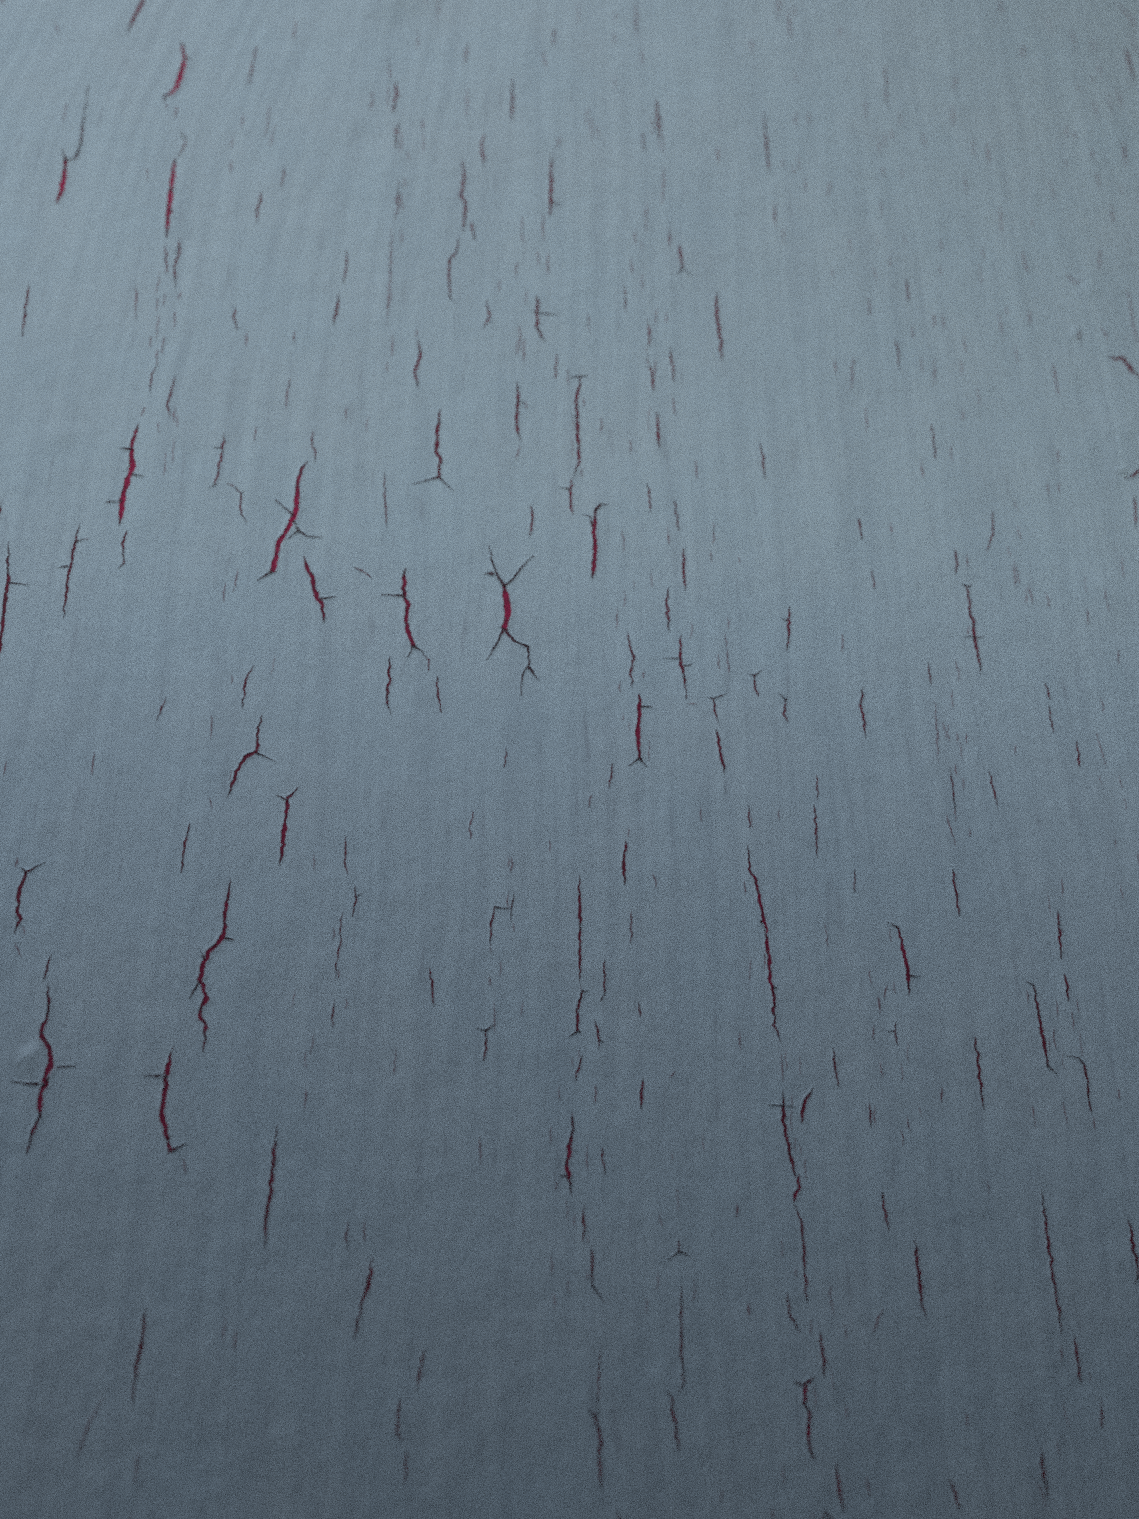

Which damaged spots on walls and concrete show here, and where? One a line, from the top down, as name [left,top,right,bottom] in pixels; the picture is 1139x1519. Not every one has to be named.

crack [209,331,443,715]
crack [369,0,453,529]
crack [445,2,793,808]
crack [830,2,1139,478]
crack [926,449,1139,917]
crack [11,857,75,1154]
crack [144,880,234,1175]
crack [179,656,362,1248]
crack [645,1134,705,1452]
crack [737,775,985,1519]
crack [1015,1189,1104,1519]
crack [1026,877,1121,1131]